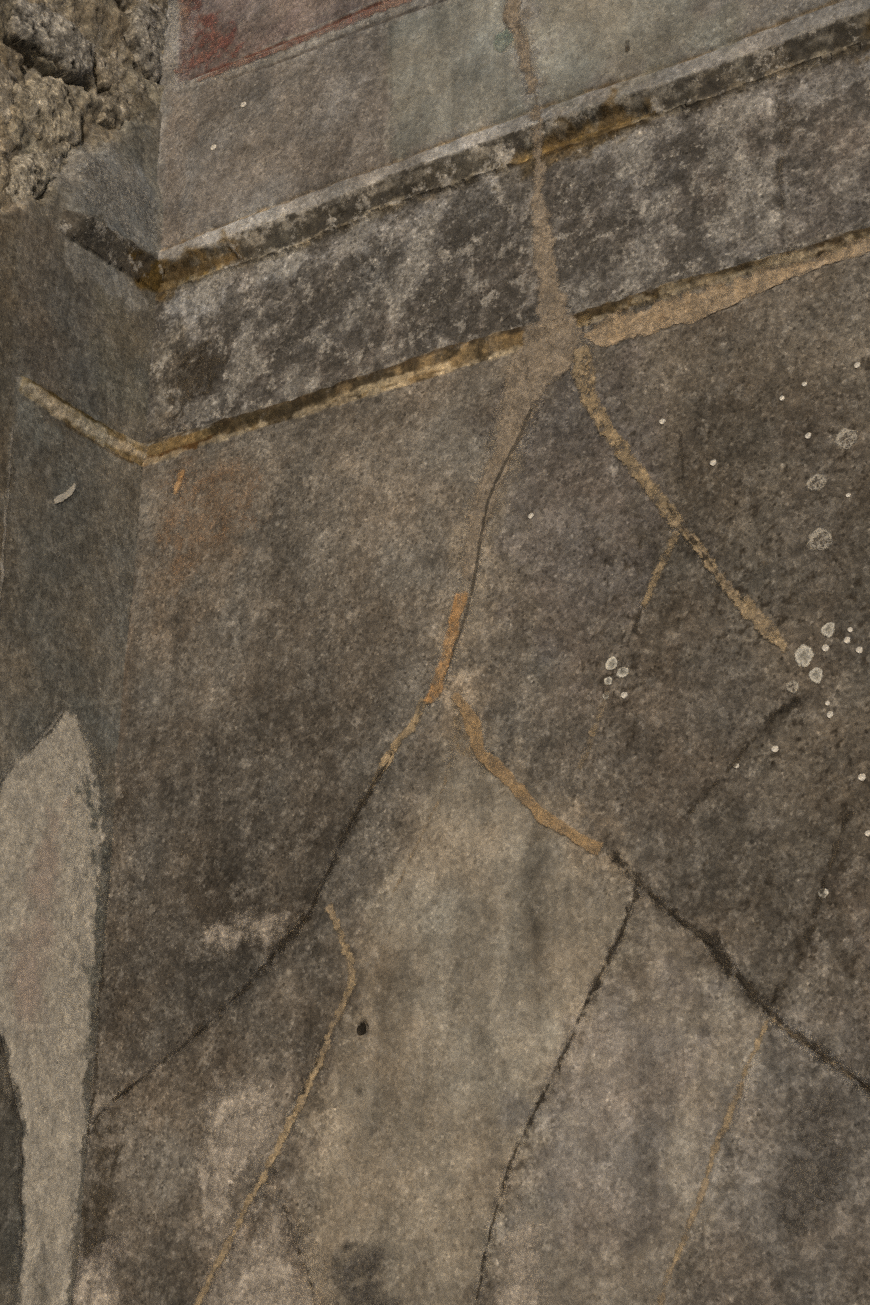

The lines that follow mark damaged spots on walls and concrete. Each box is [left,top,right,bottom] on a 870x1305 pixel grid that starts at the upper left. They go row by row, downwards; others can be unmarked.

crack [86,955,207,1142]
crack [195,0,870,1305]